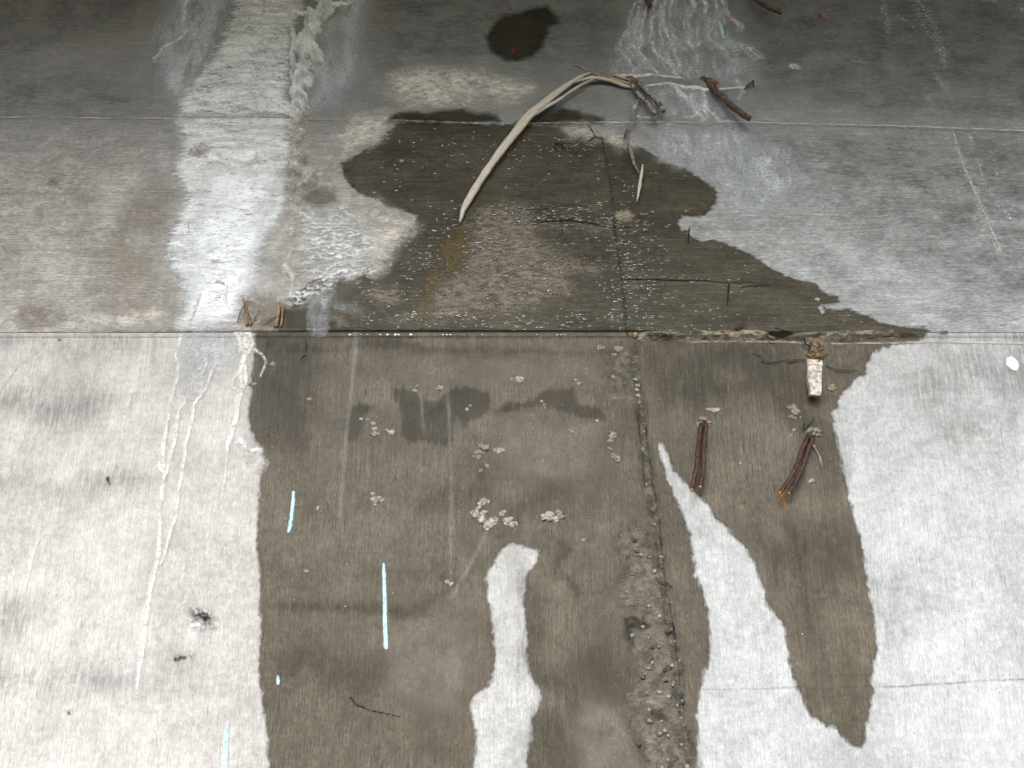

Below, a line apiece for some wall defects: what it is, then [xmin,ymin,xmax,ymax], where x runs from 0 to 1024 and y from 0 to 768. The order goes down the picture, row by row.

crack [528,205,630,234]
crack [624,278,765,305]
leakage [153,0,931,768]